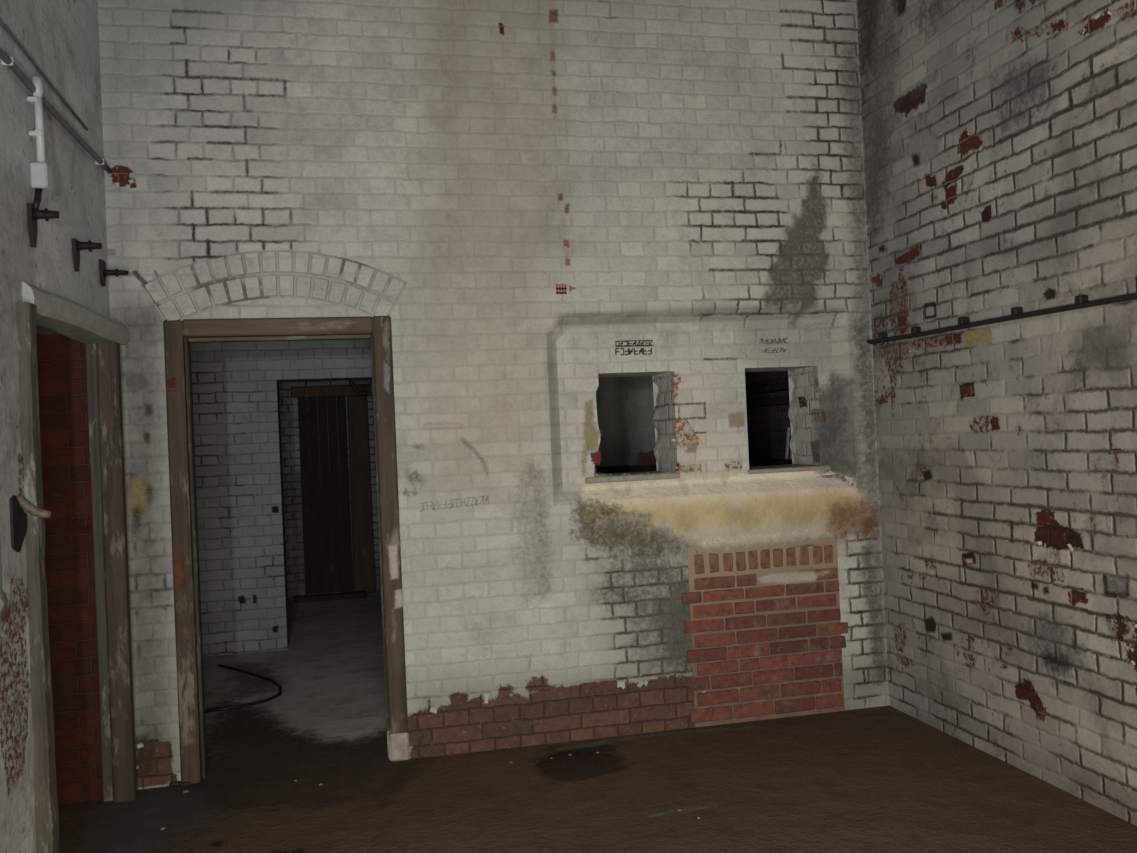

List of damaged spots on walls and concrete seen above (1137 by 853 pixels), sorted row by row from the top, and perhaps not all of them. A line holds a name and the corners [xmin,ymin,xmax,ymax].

peeling [1010,0,1136,42]
spalling [111,165,137,188]
spalling [912,128,983,209]
leakage [766,177,828,307]
leakage [580,501,810,554]
spalling [1028,509,1088,605]
spalling [1103,574,1137,694]
peeling [407,675,706,759]
spalling [1015,678,1046,722]